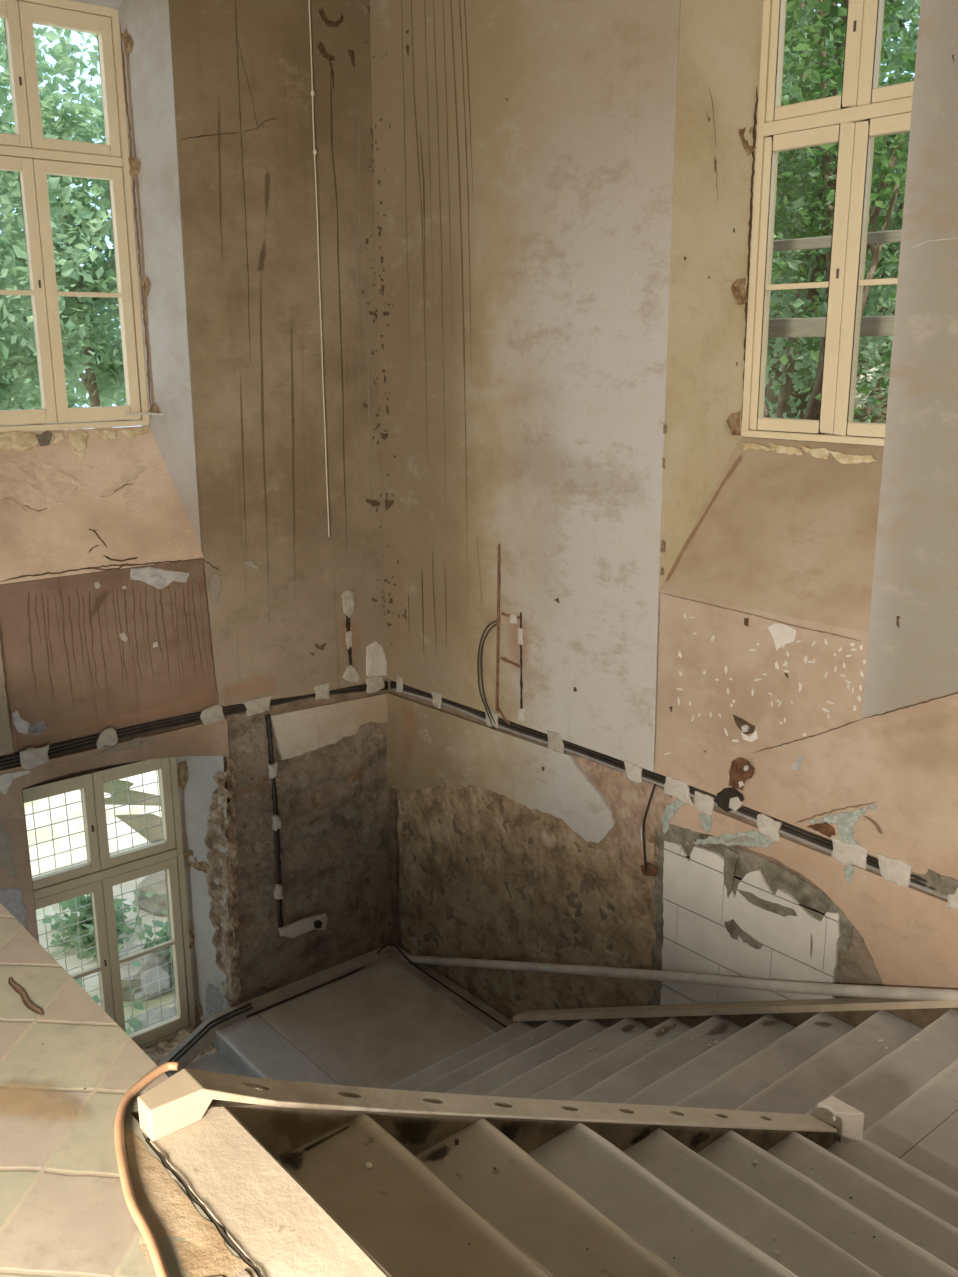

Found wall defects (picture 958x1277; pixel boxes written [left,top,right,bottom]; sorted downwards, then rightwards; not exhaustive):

crack [182,0,277,361]
water stain [401,0,472,397]
spalling [366,493,394,528]
crack [0,528,219,702]
crack [0,628,12,732]
spalling [669,651,758,742]
peeling [750,623,866,725]
flaking render [183,712,684,1028]
peeling [686,757,776,848]
peeling [794,802,876,845]